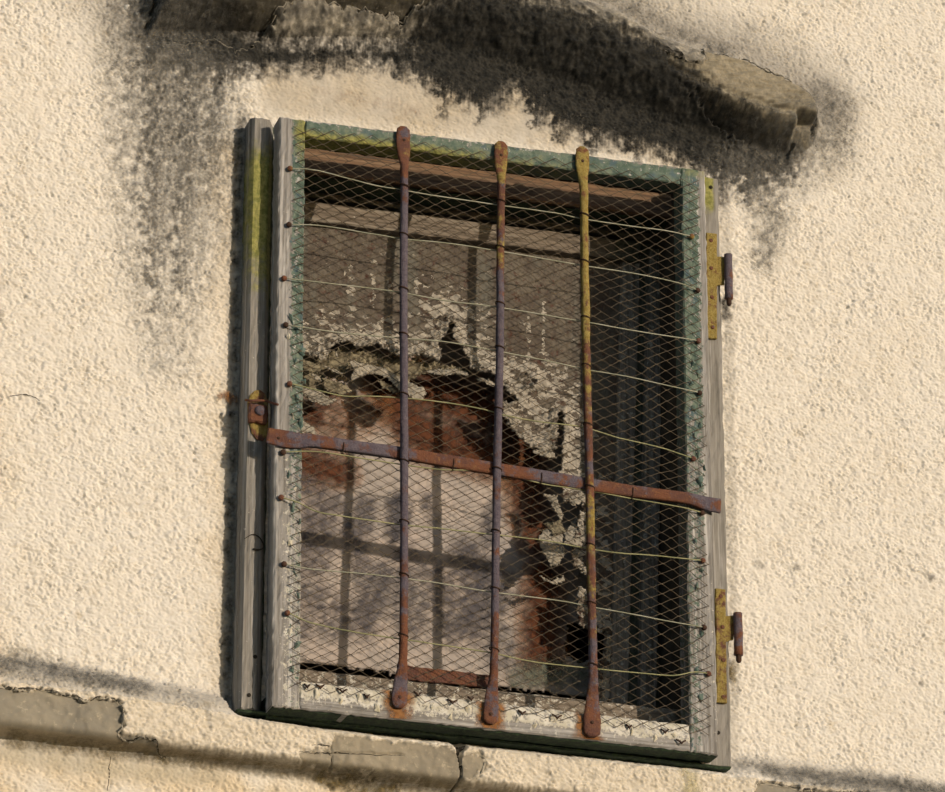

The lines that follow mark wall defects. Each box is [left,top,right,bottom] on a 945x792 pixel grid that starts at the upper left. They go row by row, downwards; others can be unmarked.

water stain [110,0,846,289]
peeling [290,347,427,434]
peeling [427,367,495,387]
peeling [533,449,557,459]
flaking render [0,686,166,760]
rust [384,690,414,719]
rust [476,701,505,729]
crack [451,745,466,791]
flaking render [755,782,828,792]